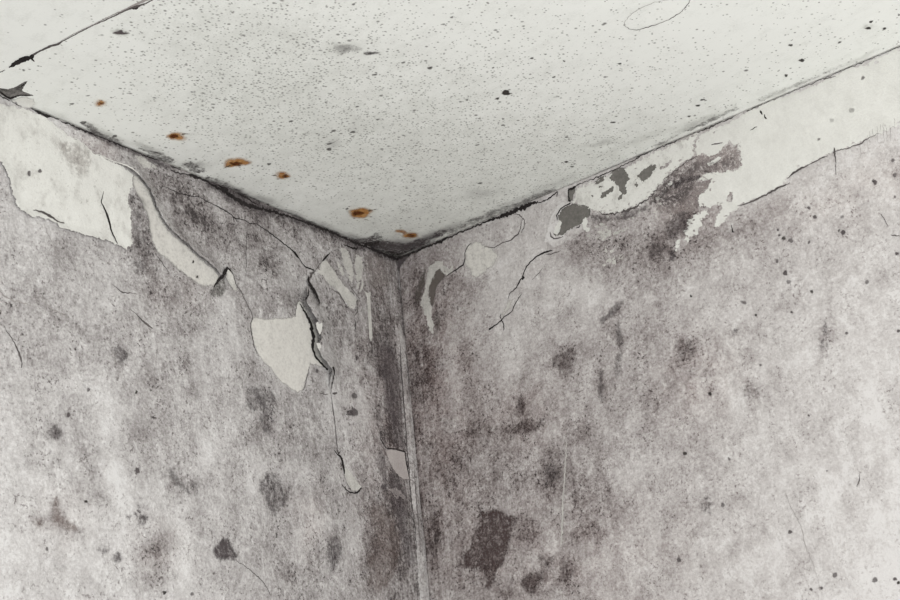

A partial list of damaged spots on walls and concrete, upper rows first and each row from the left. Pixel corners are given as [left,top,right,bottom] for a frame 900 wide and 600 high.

crack [1,0,153,72]
peeling [0,81,238,296]
rust [225,159,250,168]
spalling [247,247,363,392]
rust [350,208,376,218]
crack [0,46,900,474]
spalling [415,221,522,333]
peeling [544,48,900,267]
spalling [380,435,409,479]
damp [463,507,517,588]